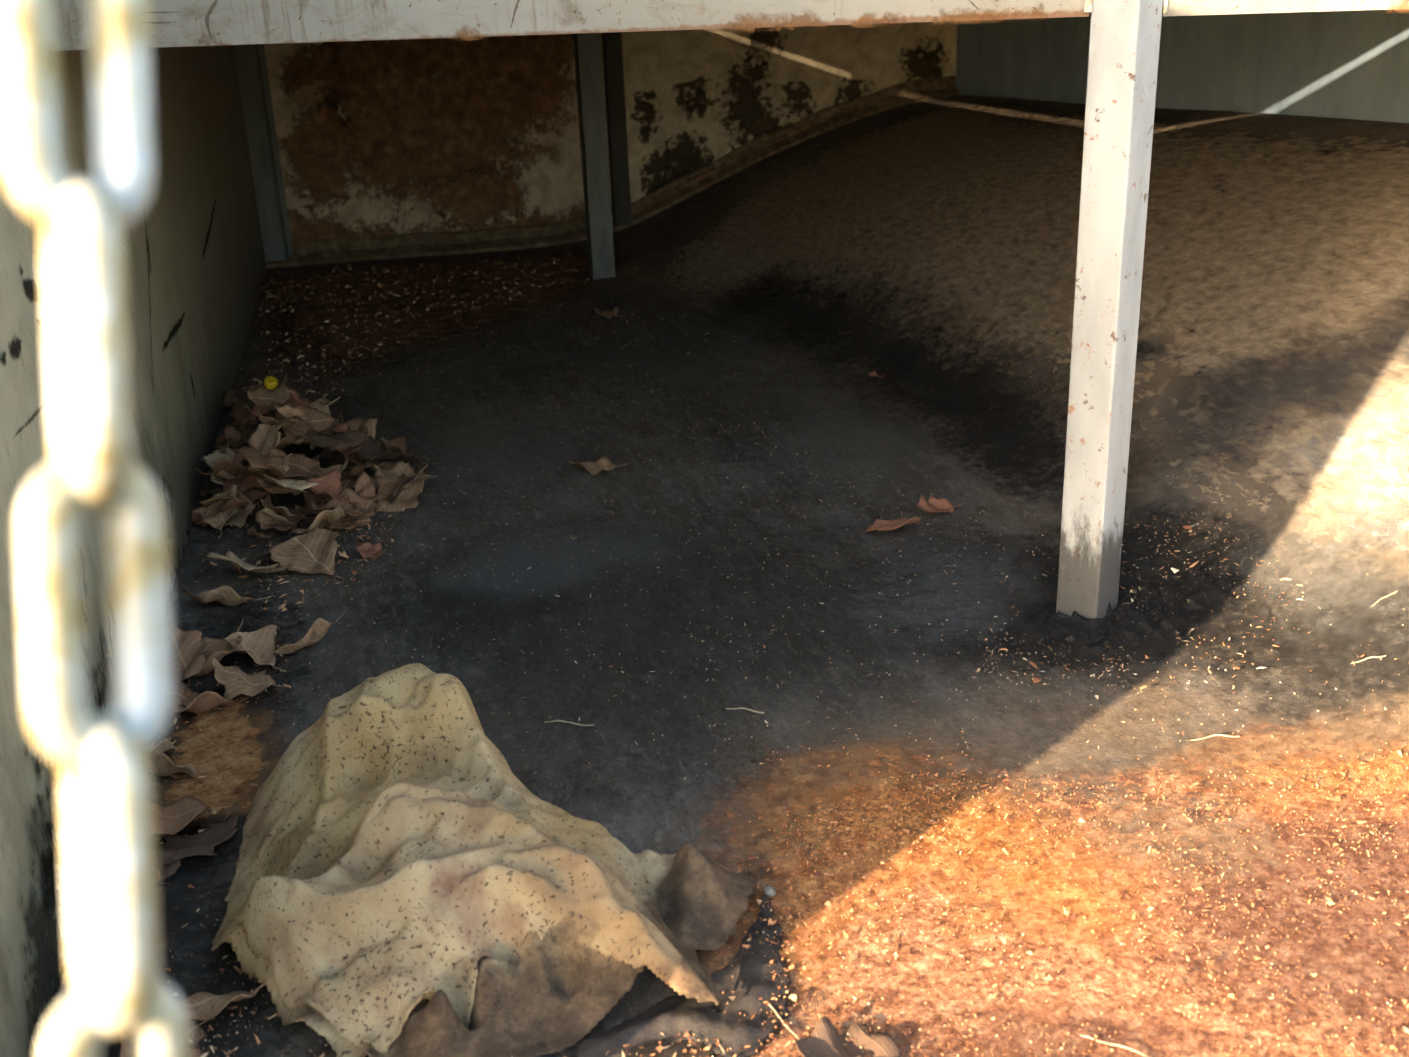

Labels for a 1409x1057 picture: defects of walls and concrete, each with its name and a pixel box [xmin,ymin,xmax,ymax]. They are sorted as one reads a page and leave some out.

corrosion [728,14,823,30]
corrosion [853,14,898,28]
corrosion [935,11,1009,23]
damp [82,555,114,714]
damp [21,712,67,1057]